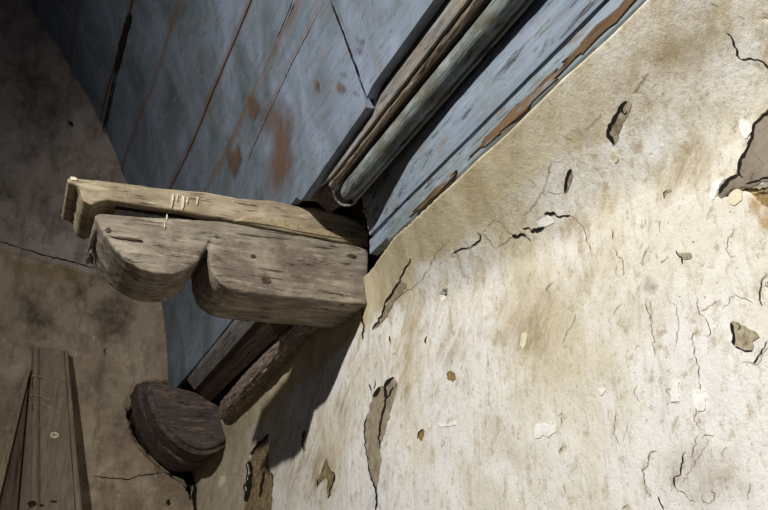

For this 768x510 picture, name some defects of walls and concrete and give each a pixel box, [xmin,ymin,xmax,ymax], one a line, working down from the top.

crack [723,16,768,69]
peeling [469,0,636,163]
spalling [709,109,768,207]
peeling [408,170,458,218]
crack [0,241,94,268]
crack [361,164,592,355]
spalling [729,321,759,352]
peeling [363,377,397,510]
crack [94,472,158,480]
peeling [243,434,274,510]
spalling [317,458,335,498]